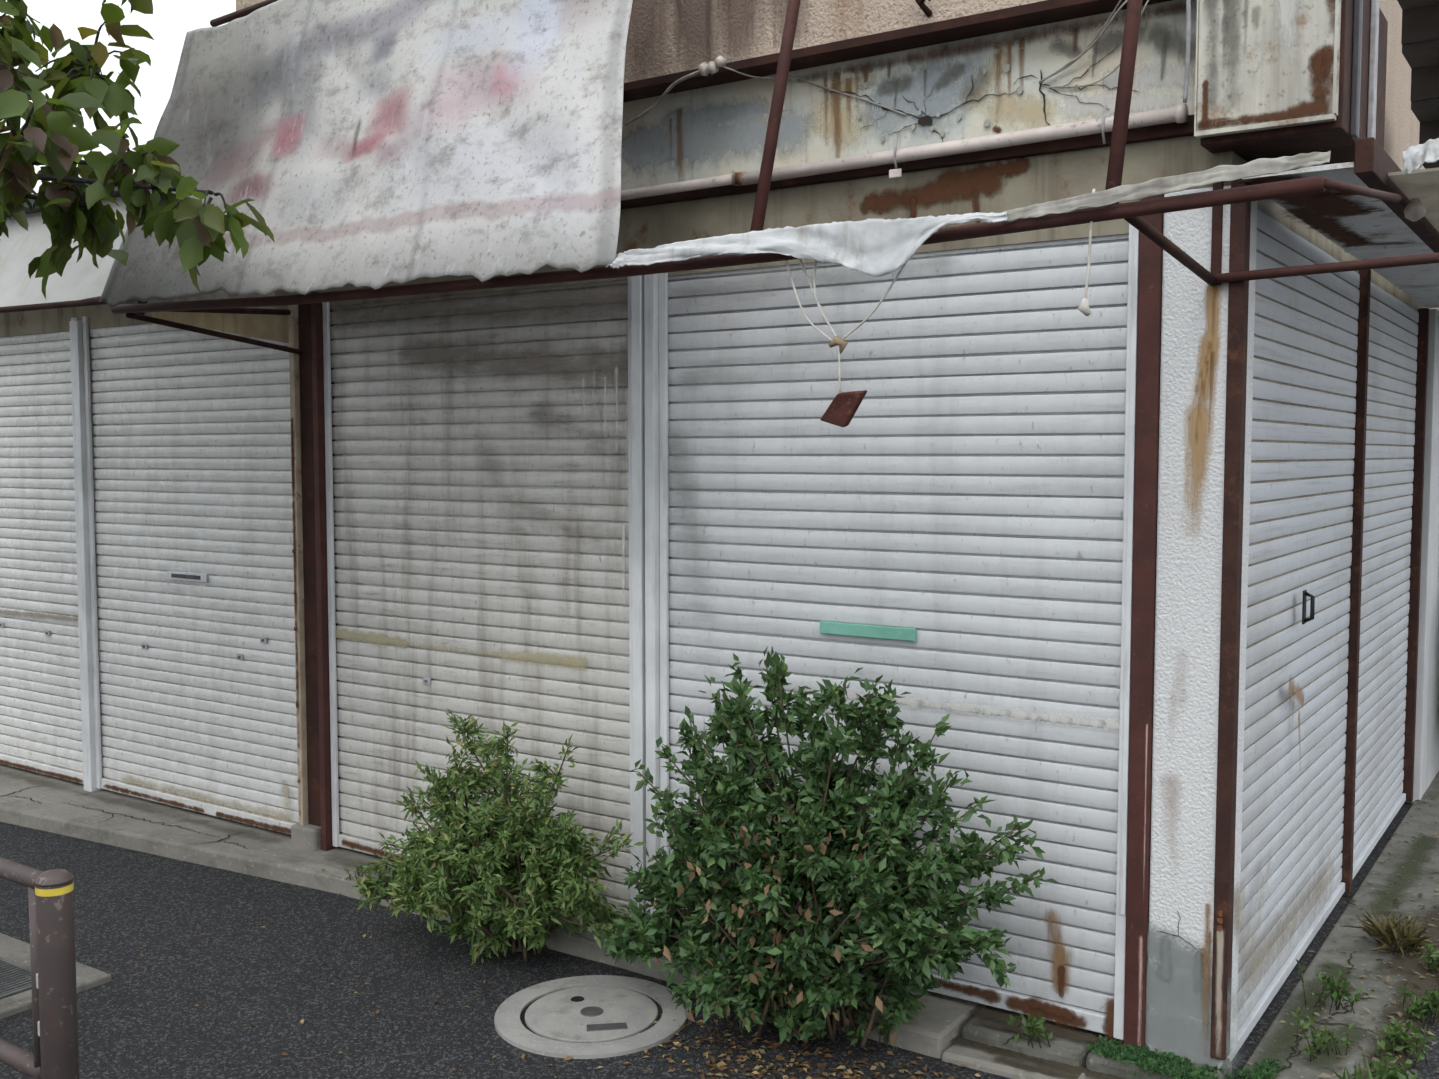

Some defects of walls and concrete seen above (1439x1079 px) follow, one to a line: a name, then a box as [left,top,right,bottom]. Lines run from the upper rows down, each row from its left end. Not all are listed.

corrosion [670,109,682,170]
crack [826,45,1138,142]
corrosion [1197,45,1339,130]
corrosion [860,157,1029,223]
corrosion [1188,284,1220,509]
corrosion [899,911,1086,1028]
corrosion [1201,904,1211,1009]
corrosion [1103,999,1115,1039]